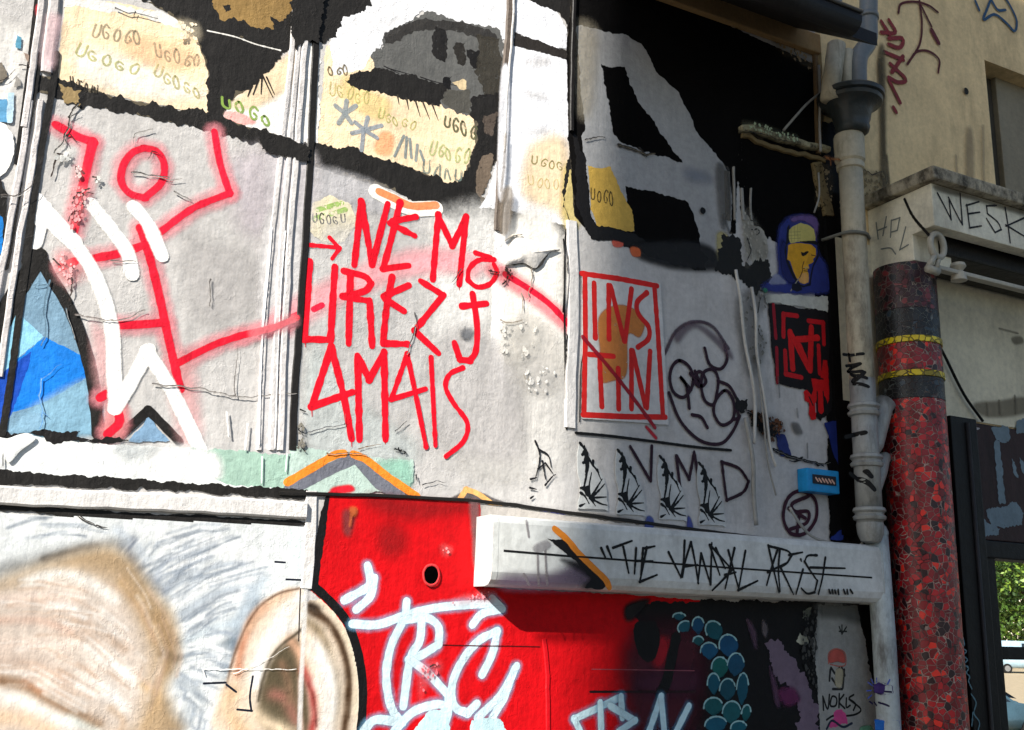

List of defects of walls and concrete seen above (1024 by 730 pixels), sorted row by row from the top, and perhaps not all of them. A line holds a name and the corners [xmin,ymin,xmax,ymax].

crack [54,102,80,153]